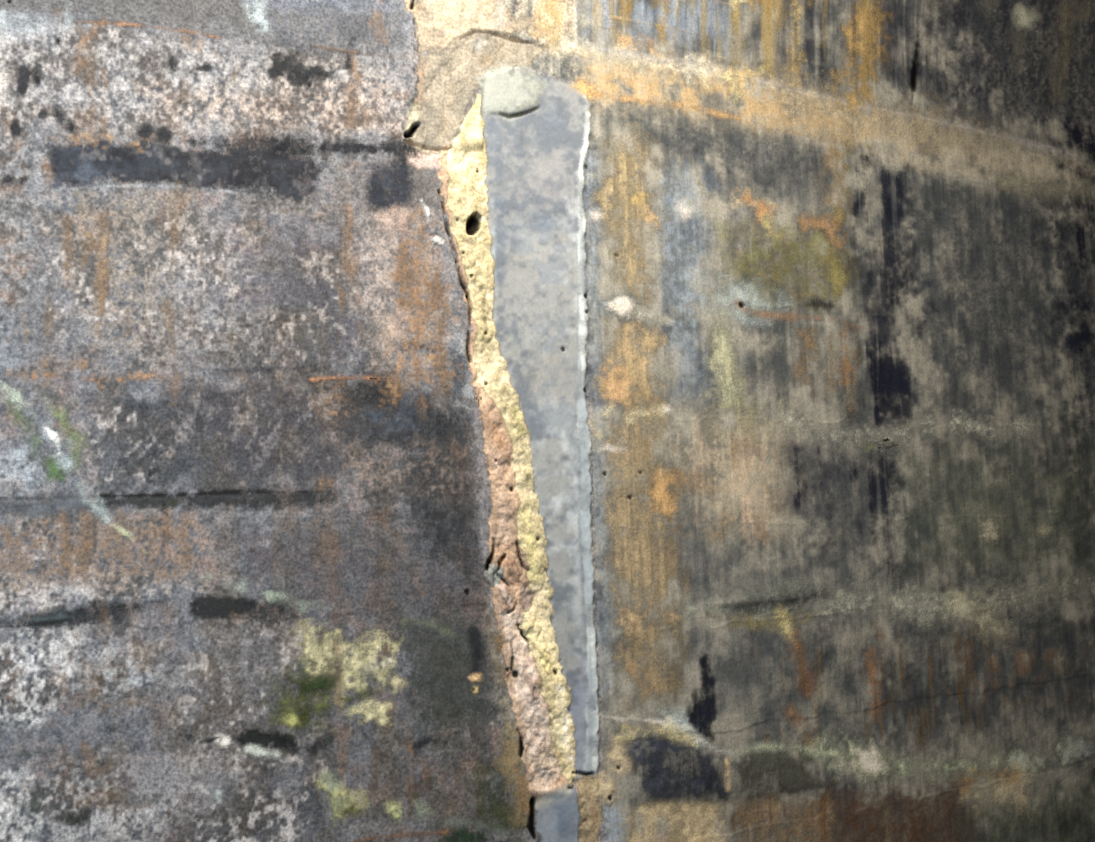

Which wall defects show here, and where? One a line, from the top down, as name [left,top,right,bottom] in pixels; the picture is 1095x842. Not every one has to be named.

leakage [11,120,21,135]
leakage [18,64,40,95]
leakage [40,110,74,130]
leakage [50,125,417,211]
leakage [268,53,329,85]
spalling [405,0,611,842]
leakage [179,581,493,757]
leakage [623,654,1093,842]